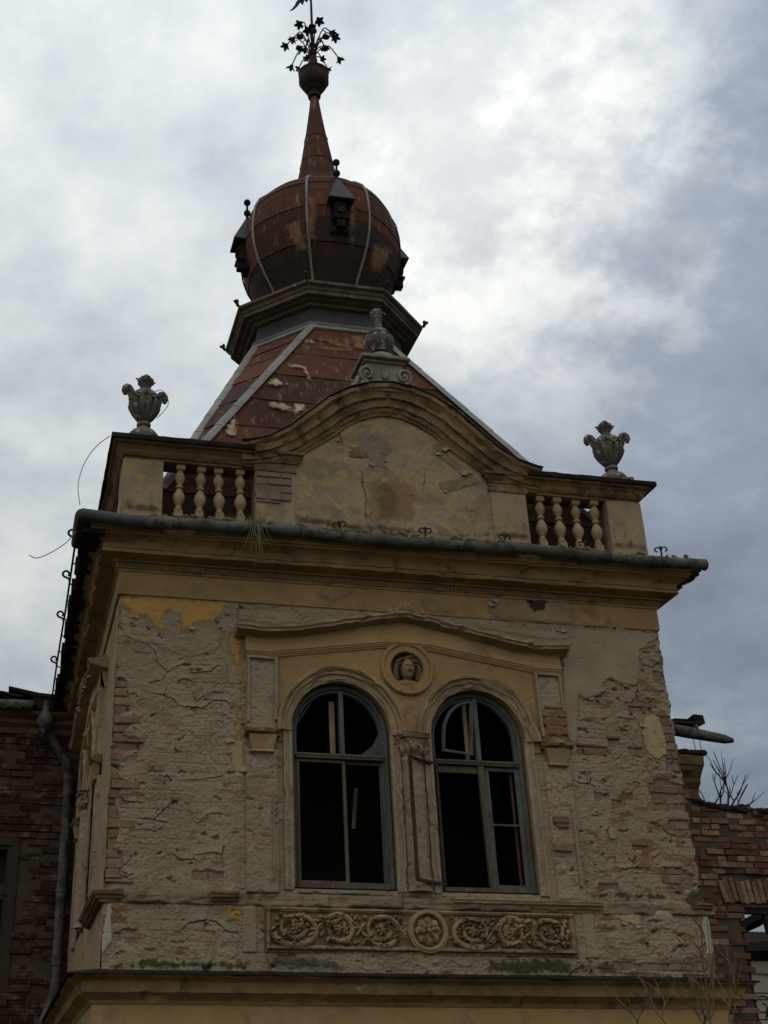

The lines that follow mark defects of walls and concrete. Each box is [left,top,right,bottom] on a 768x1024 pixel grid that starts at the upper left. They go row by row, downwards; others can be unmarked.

peeling [269,402,305,412]
crack [338,433,389,521]
peeling [123,597,226,630]
crack [117,627,235,730]
peeling [224,632,247,779]
flaking render [486,597,691,837]
flaking render [105,681,146,884]
crack [118,756,232,862]
crack [183,914,240,934]